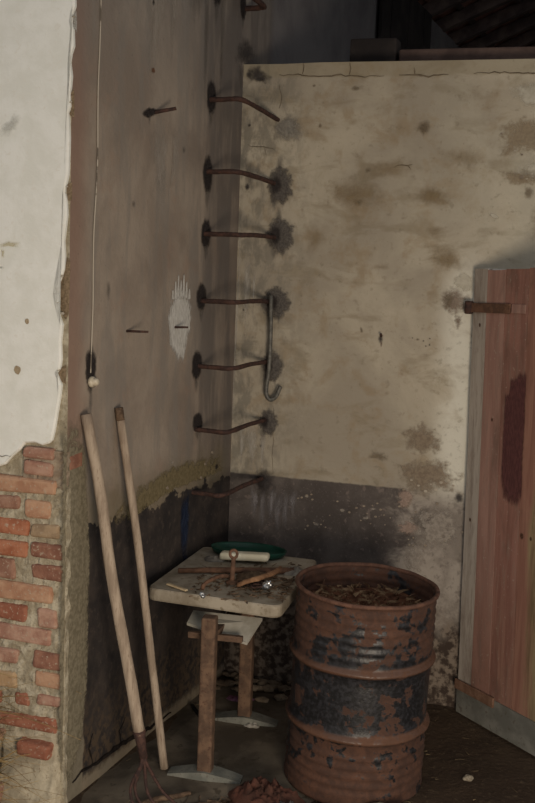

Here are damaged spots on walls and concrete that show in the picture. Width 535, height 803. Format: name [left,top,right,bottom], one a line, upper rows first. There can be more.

crack [407,68,449,78]
crack [474,68,535,76]
leakage [403,425,439,453]
leakage [400,502,464,549]
flaking render [0,446,82,803]